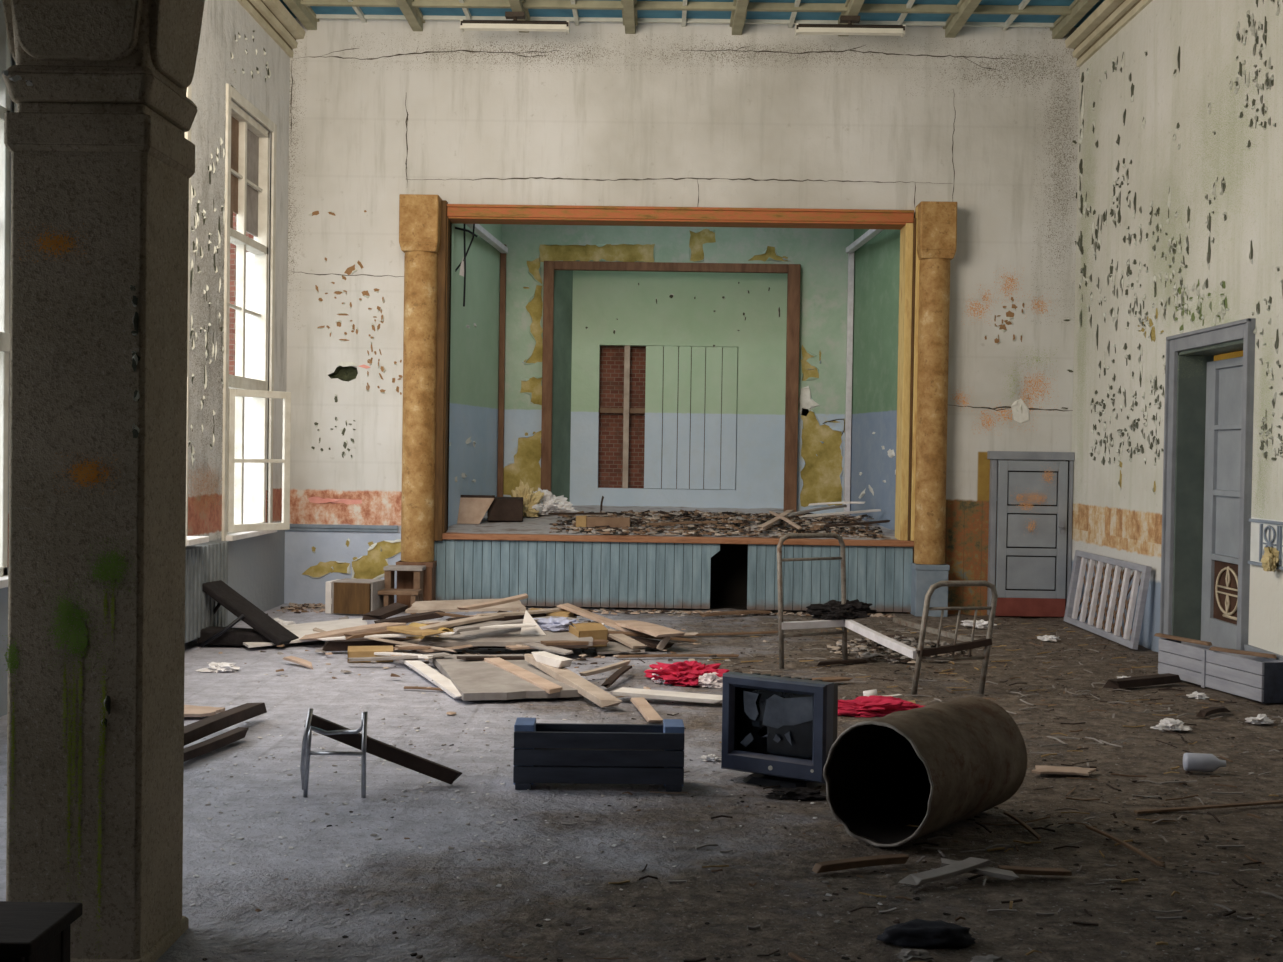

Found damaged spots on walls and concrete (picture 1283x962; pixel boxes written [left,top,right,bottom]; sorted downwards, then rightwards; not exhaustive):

crack [405,89,956,207]
crack [681,45,1018,71]
peeling [1229,0,1283,150]
peeling [188,137,226,467]
peeling [311,260,403,458]
peeling [520,244,655,405]
peeling [689,229,716,262]
peeling [1063,53,1229,495]
peeling [1251,267,1283,461]
peeling [503,431,541,497]
peeling [301,538,401,579]